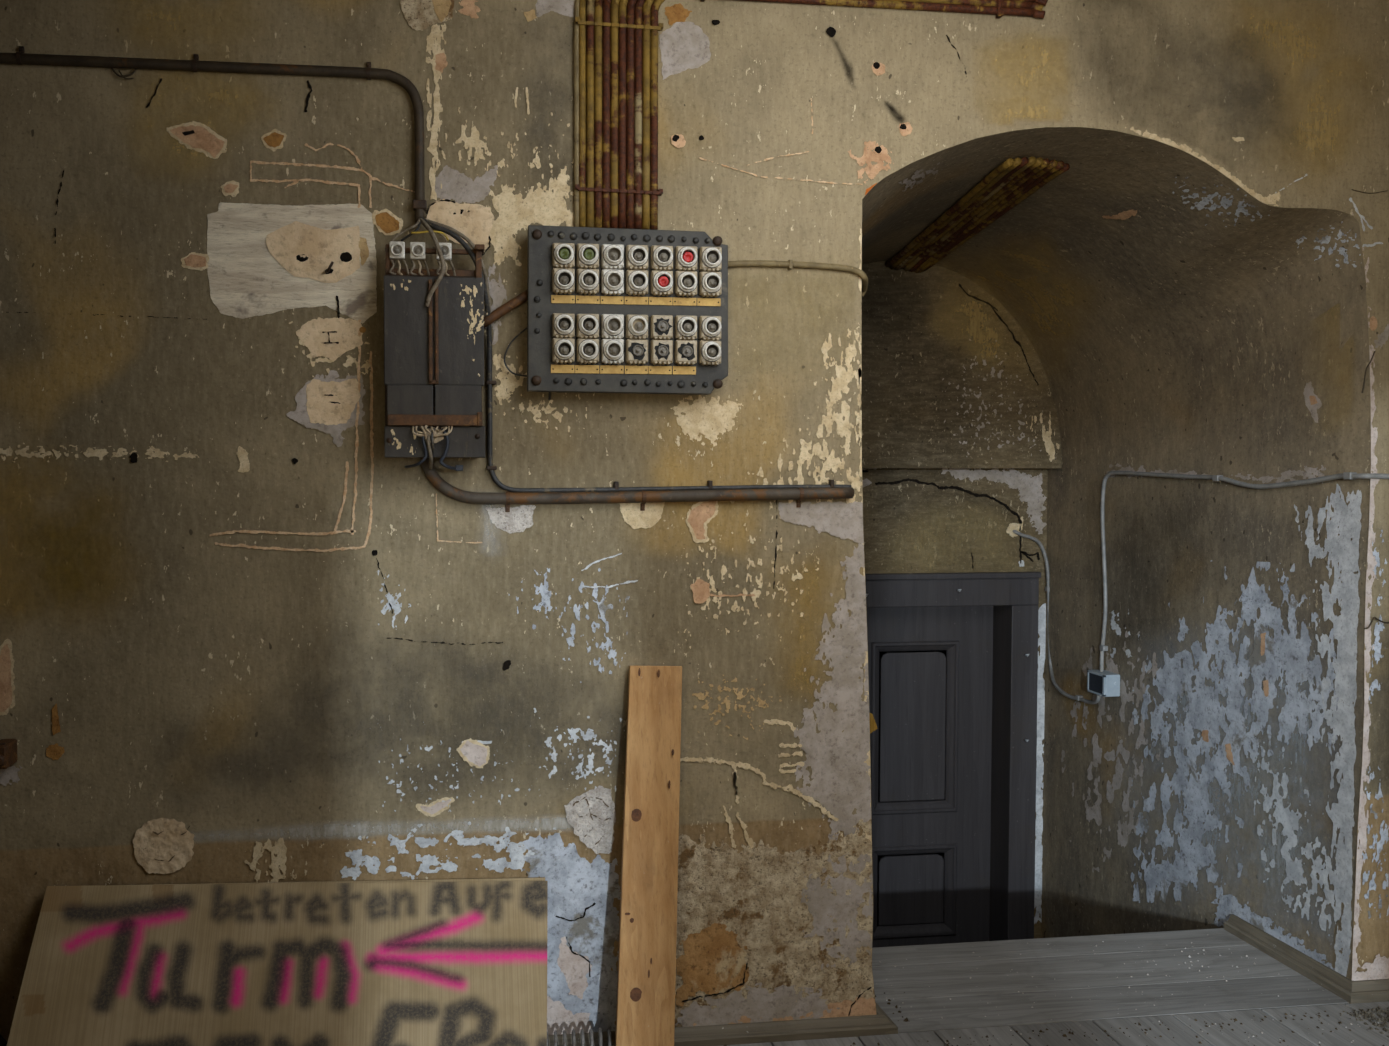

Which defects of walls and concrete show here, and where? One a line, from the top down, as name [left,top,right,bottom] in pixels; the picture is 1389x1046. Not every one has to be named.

peeling [400,0,587,432]
flaking render [678,501,819,649]
peeling [747,323,863,518]
crack [862,470,1040,564]
crack [959,284,1039,385]
peeling [1061,306,1389,981]
flaking render [675,543,875,1027]
flaking render [547,936,592,1035]